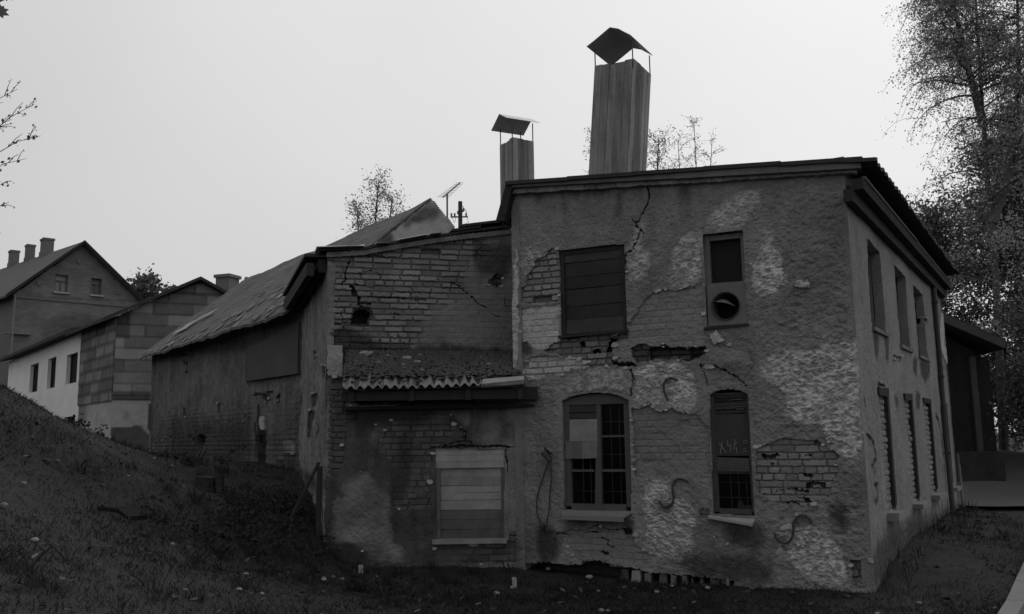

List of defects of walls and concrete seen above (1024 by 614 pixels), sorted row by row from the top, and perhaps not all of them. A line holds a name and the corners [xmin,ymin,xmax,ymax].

crack [334,255,426,324]
spalling [487,186,810,563]
peeling [752,335,874,591]